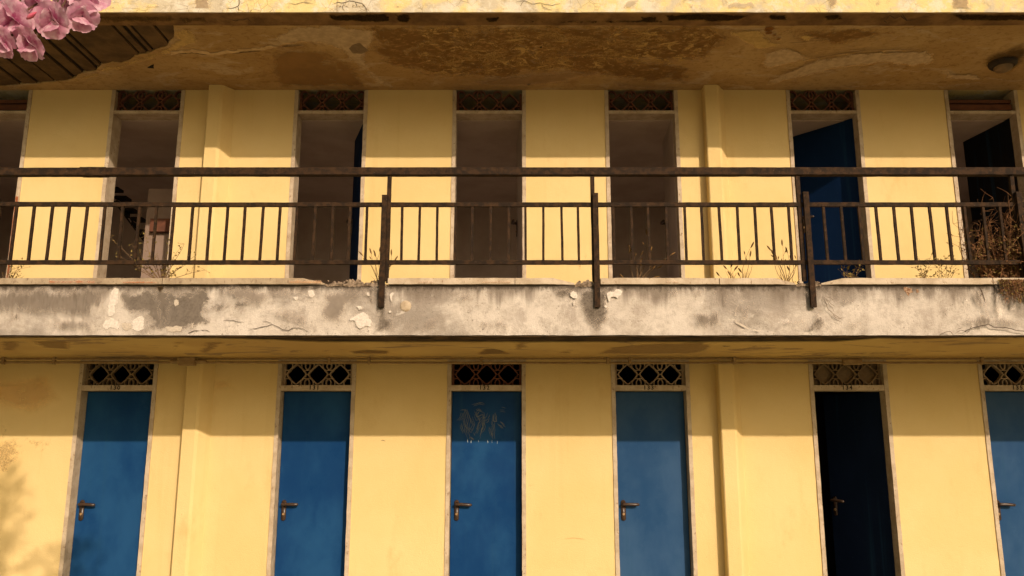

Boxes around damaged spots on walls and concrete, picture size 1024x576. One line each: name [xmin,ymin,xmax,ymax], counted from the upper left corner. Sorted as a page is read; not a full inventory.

damp [795,0,878,44]
peeling [80,25,393,88]
damp [330,5,746,87]
peeling [763,48,934,83]
peeling [103,288,144,332]
damp [121,286,223,329]
spalling [326,279,394,328]
peeling [605,289,623,307]
crack [941,287,1020,334]